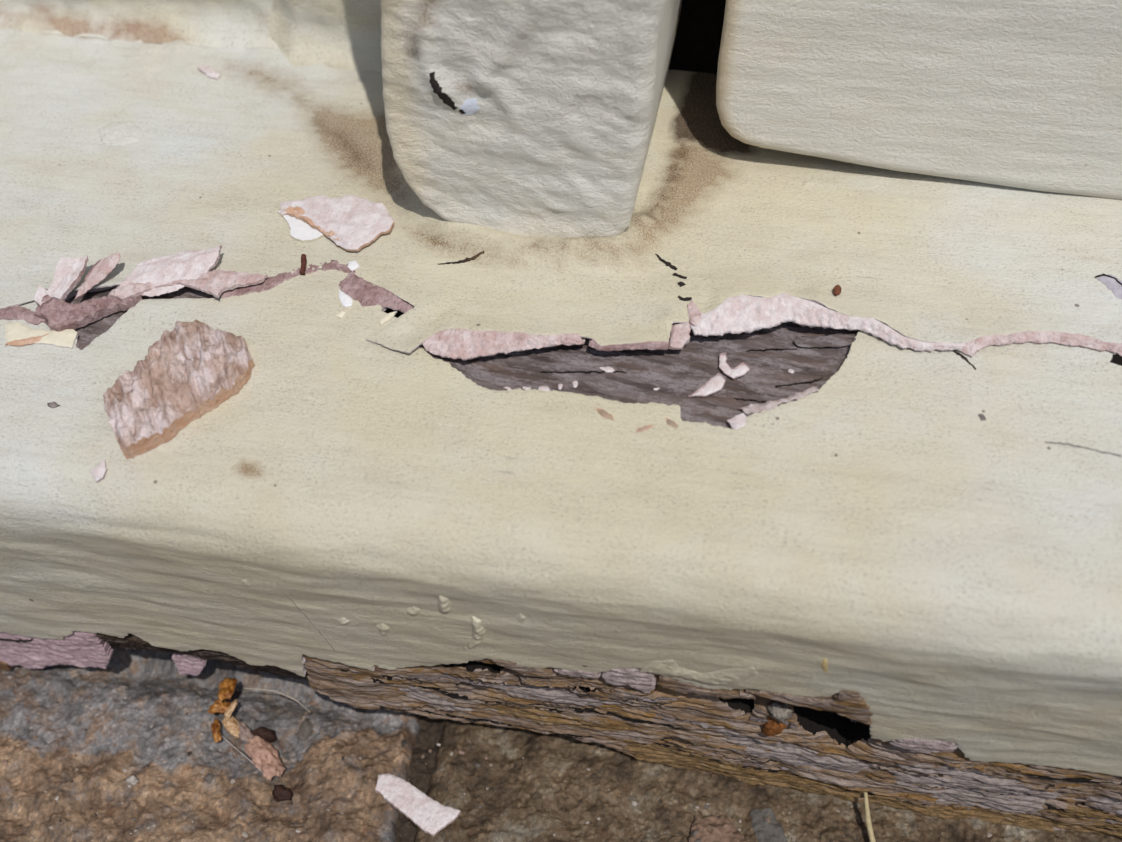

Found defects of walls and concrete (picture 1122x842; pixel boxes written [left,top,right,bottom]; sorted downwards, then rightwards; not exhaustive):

peeling [0,245,414,350]
peeling [420,293,1122,430]